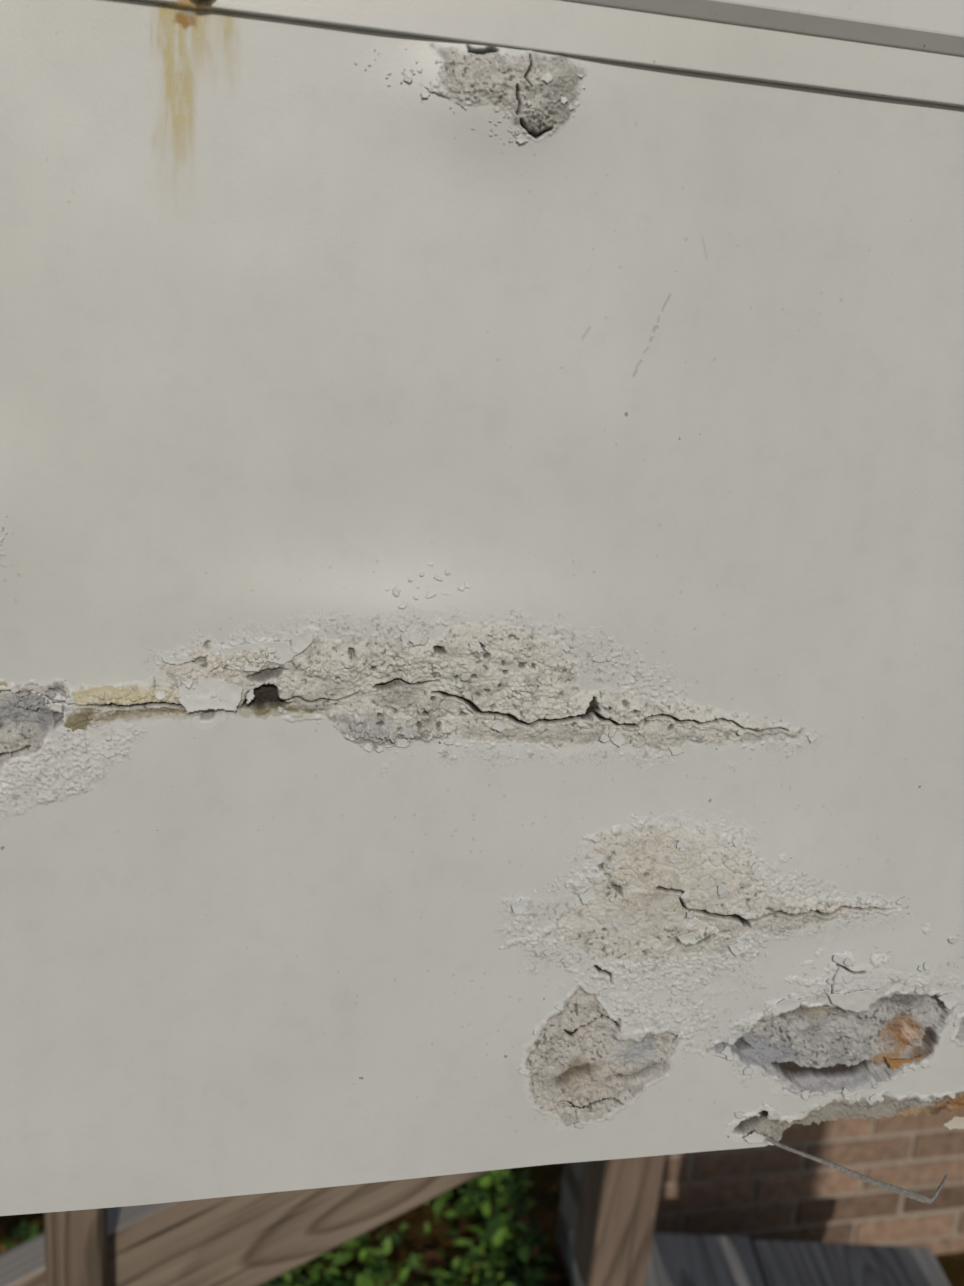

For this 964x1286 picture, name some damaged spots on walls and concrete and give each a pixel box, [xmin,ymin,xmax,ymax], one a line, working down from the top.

corrosion [161,0,196,87]
spalling [385,39,591,147]
peeling [0,601,825,824]
crack [520,708,630,724]
crack [680,900,748,921]
peeling [493,807,964,1146]